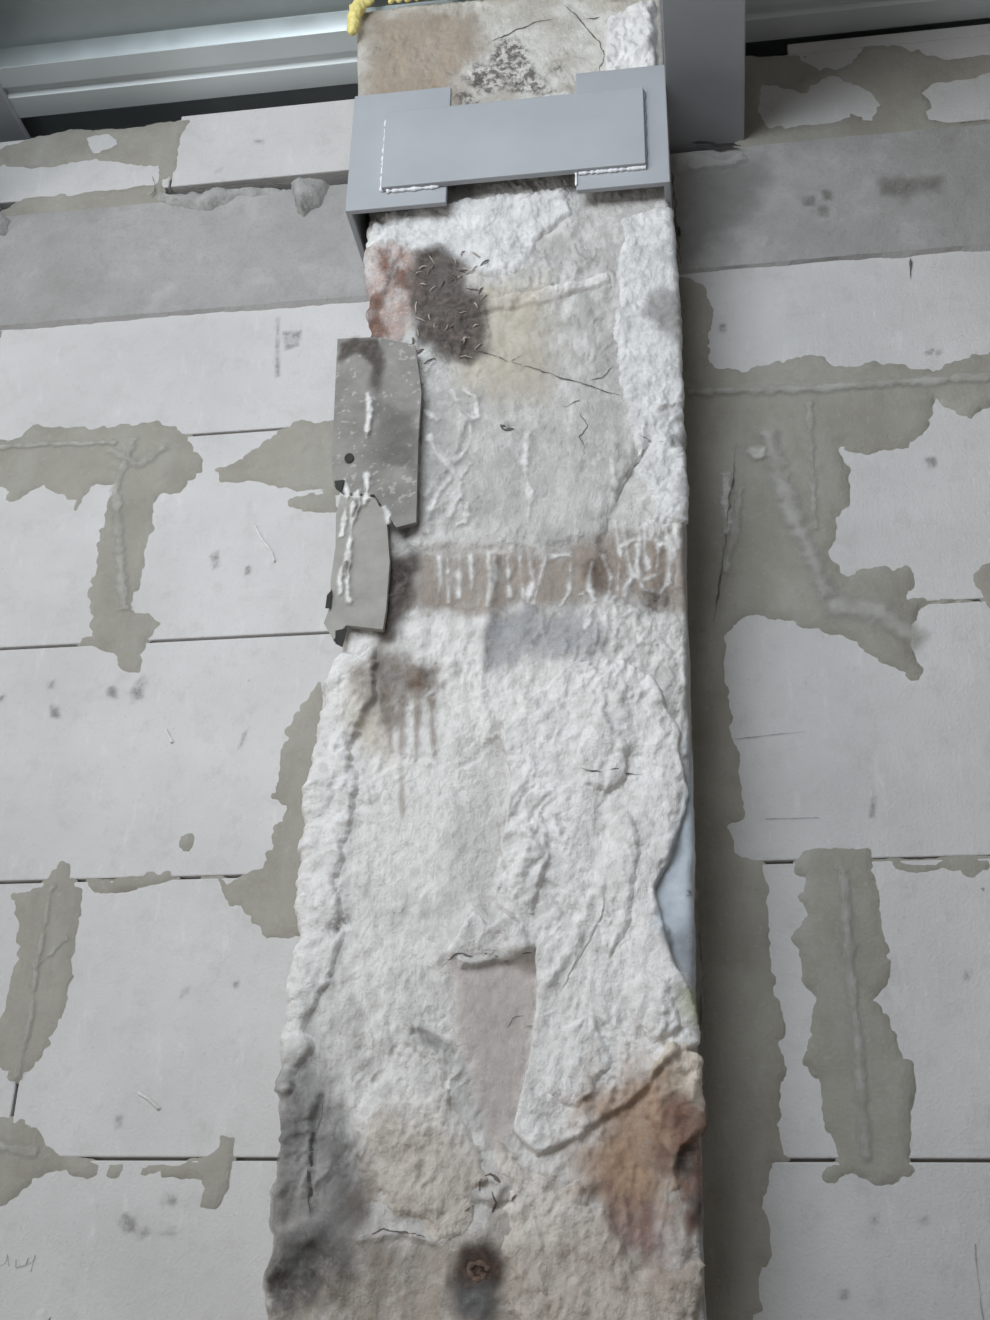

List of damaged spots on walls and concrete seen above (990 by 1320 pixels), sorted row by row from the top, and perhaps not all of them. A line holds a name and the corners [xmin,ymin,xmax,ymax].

water stain [269,1091,358,1231]
corrosion [594,1082,709,1247]
corrosion [454,1243,502,1317]